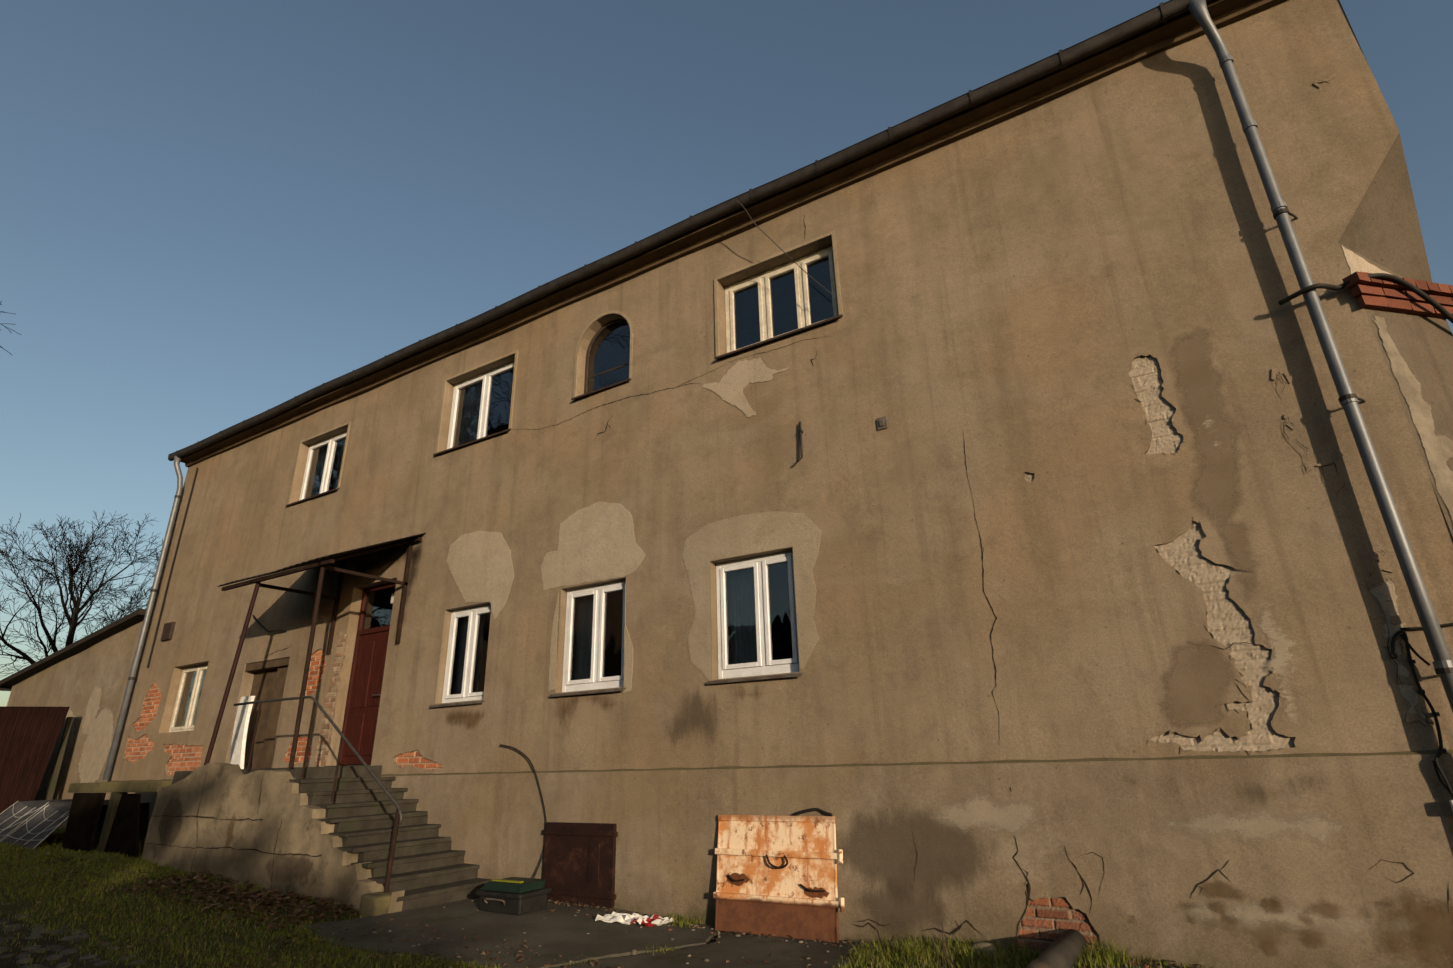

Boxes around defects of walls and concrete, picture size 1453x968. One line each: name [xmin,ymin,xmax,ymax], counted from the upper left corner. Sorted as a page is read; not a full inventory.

flaking render [1374,316,1453,521]
crack [962,429,1000,740]
spalling [1128,330,1295,756]
spalling [298,649,326,697]
flaking render [39,682,204,791]
spalling [282,736,312,765]
spalling [392,750,443,770]
crack [852,835,1031,939]
spalling [1015,881,1101,954]
crack [1064,846,1104,914]